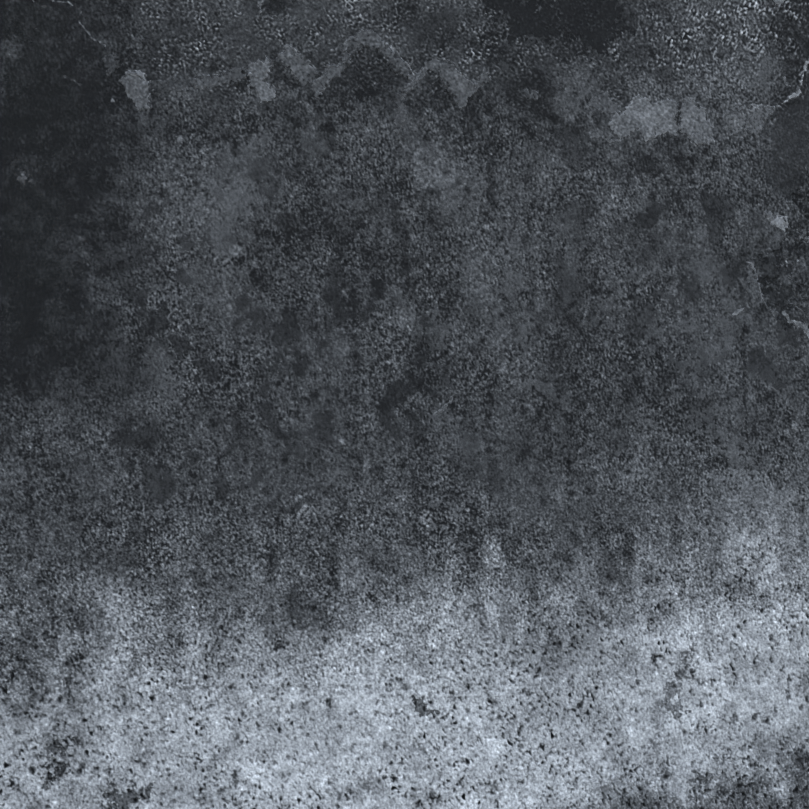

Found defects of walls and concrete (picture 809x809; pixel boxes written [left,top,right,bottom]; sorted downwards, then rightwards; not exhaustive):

flaking render [102,29,492,139]
flaking render [587,92,715,145]
flaking render [722,103,771,150]
crack [750,76,801,108]
spalling [744,178,809,331]